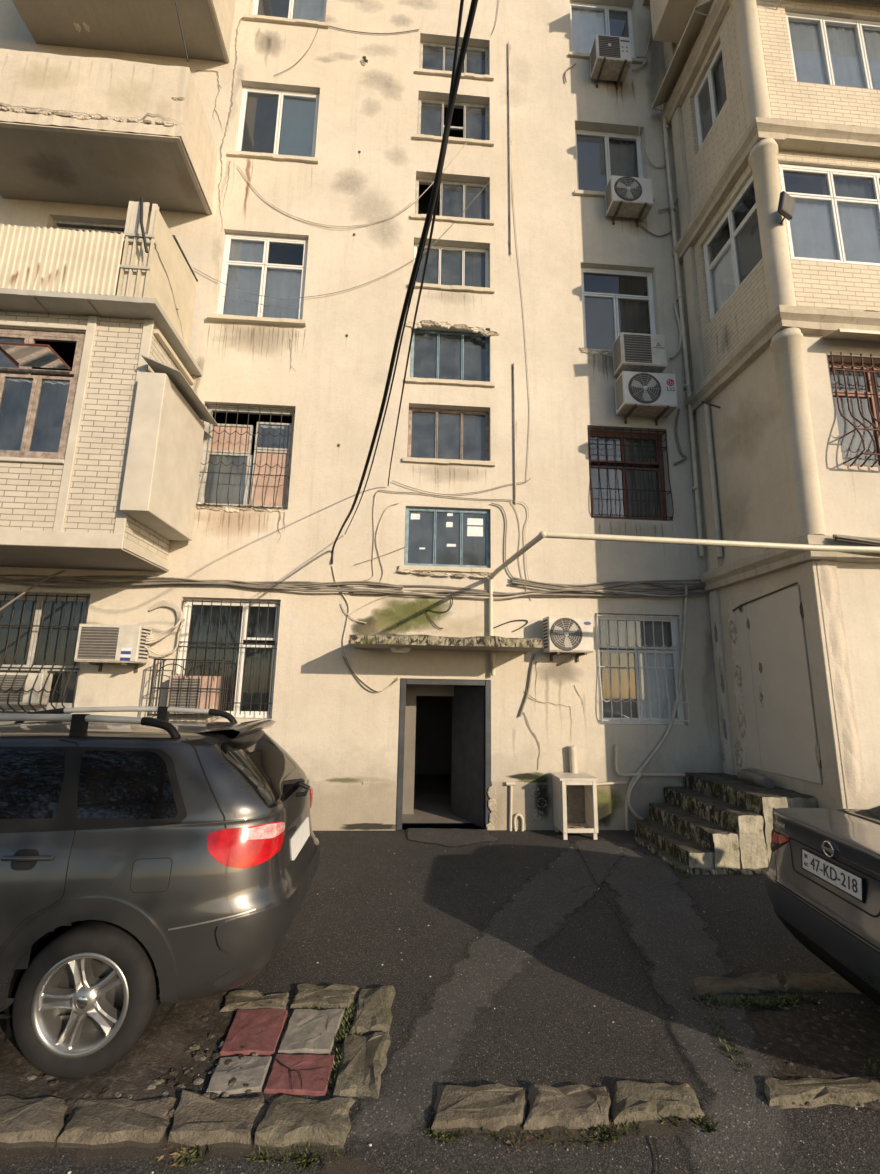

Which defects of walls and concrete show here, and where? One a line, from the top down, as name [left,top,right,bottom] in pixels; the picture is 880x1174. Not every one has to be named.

spalling [0,106,179,127]
spalling [403,320,499,336]
crack [275,1059,331,1088]